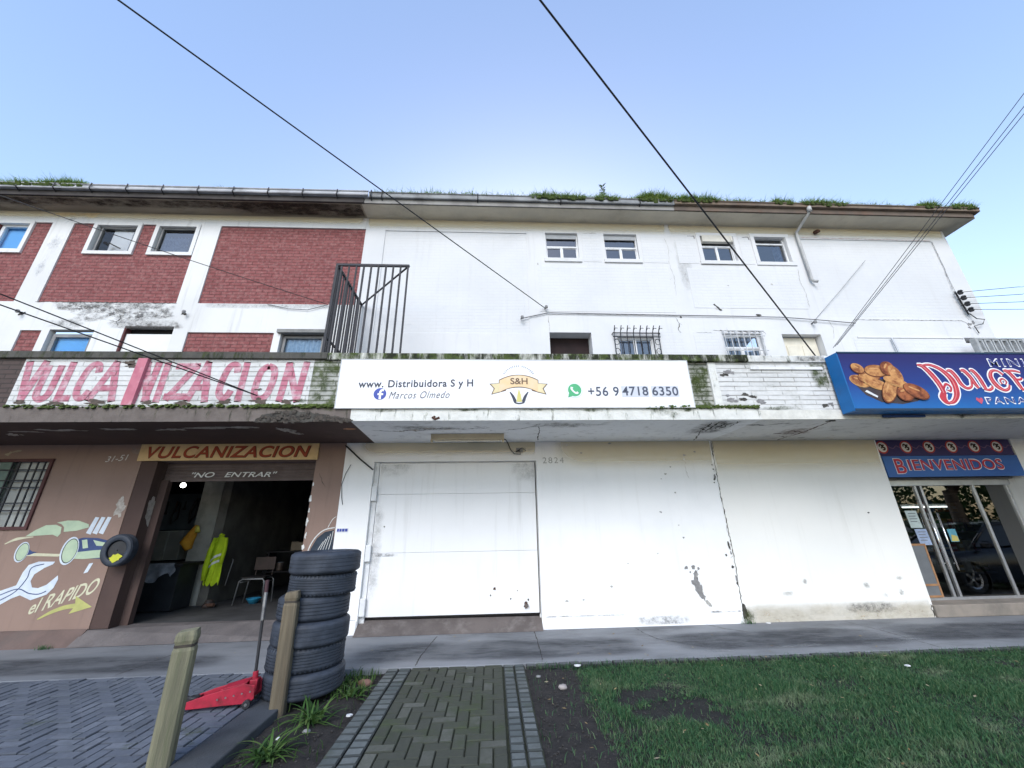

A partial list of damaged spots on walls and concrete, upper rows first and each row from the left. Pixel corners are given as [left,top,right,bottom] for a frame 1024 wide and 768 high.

water stain [59,302,178,328]
spalling [155,388,355,435]
water stain [692,367,708,398]
peeling [726,393,766,404]
water stain [567,421,878,458]
crack [711,444,748,620]
spalling [684,565,712,607]